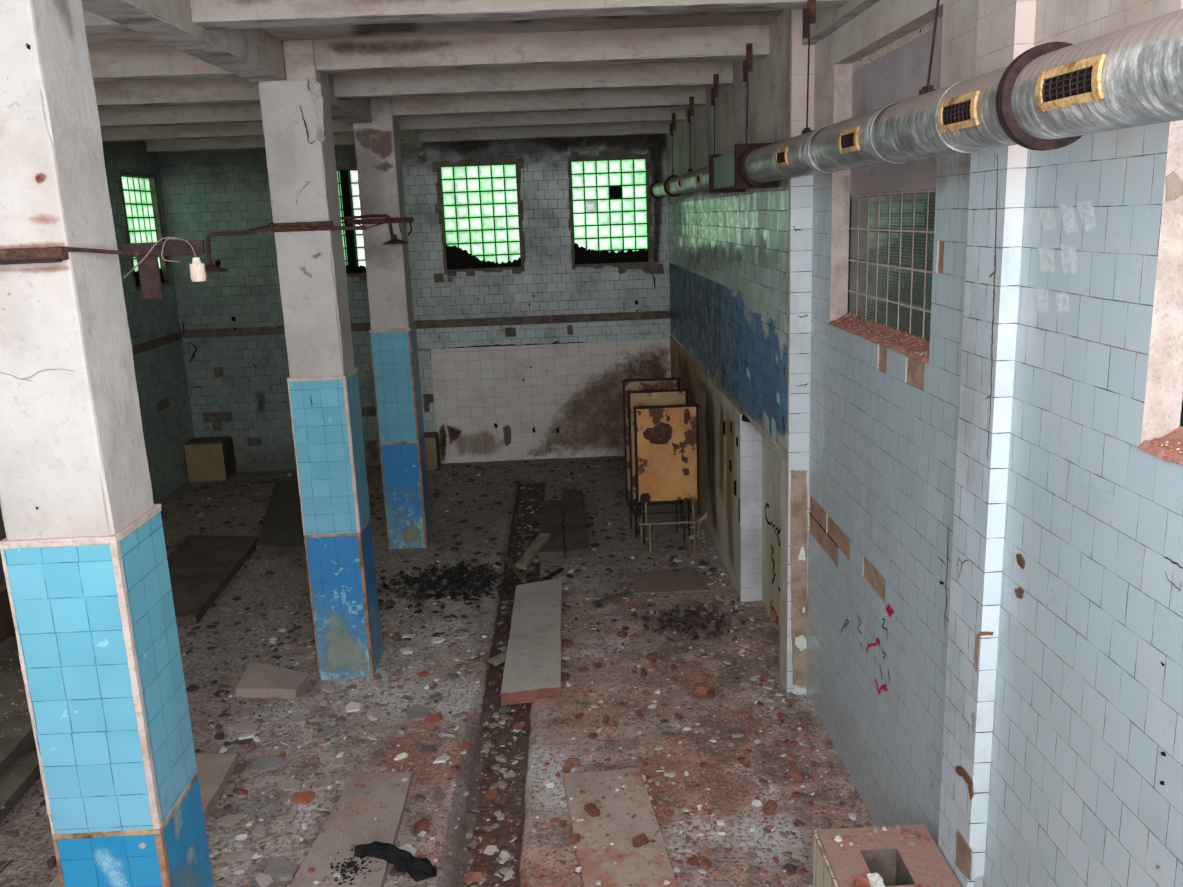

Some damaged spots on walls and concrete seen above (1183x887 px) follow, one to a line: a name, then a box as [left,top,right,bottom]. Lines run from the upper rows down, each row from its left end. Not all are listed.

peeling [356,129,394,171]
peeling [735,269,789,322]
crack [0,369,75,381]
peeling [809,495,850,567]
peeling [863,557,886,601]
peeling [325,615,368,671]